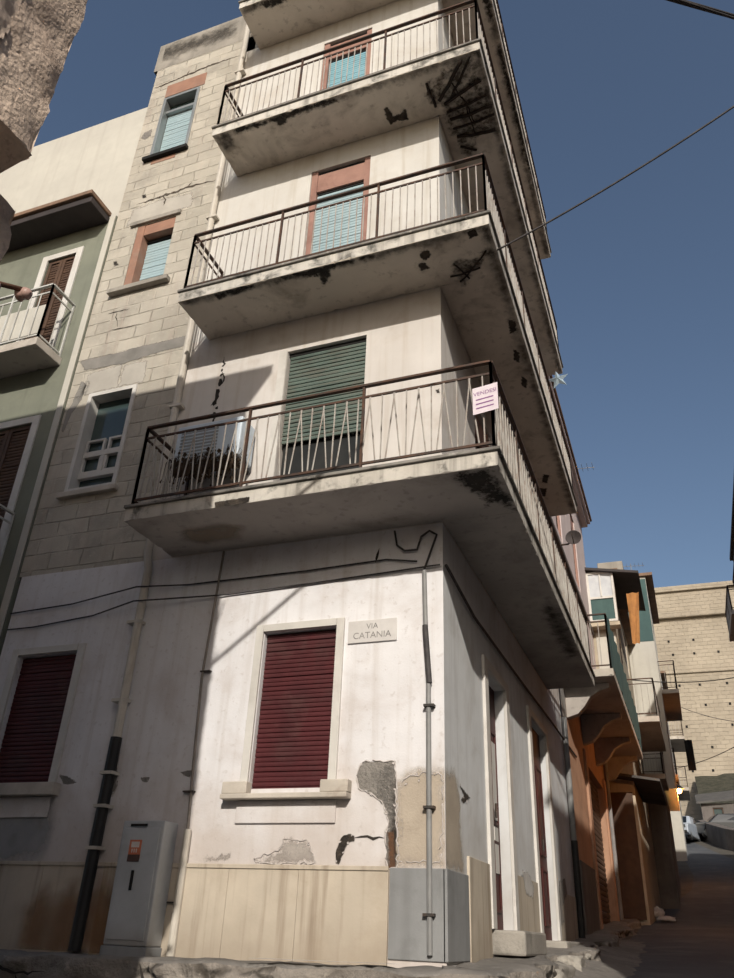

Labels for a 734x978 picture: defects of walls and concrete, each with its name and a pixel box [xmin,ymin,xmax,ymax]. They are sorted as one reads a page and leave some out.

water stain [244,0,286,12]
water stain [218,95,345,150]
spalling [384,107,409,125]
spalling [425,55,496,155]
water stain [483,0,535,205]
crack [138,180,215,204]
spalling [450,250,492,285]
crack [211,360,226,422]
flaking render [356,759,470,871]
peeling [253,838,316,865]
crack [335,834,383,864]